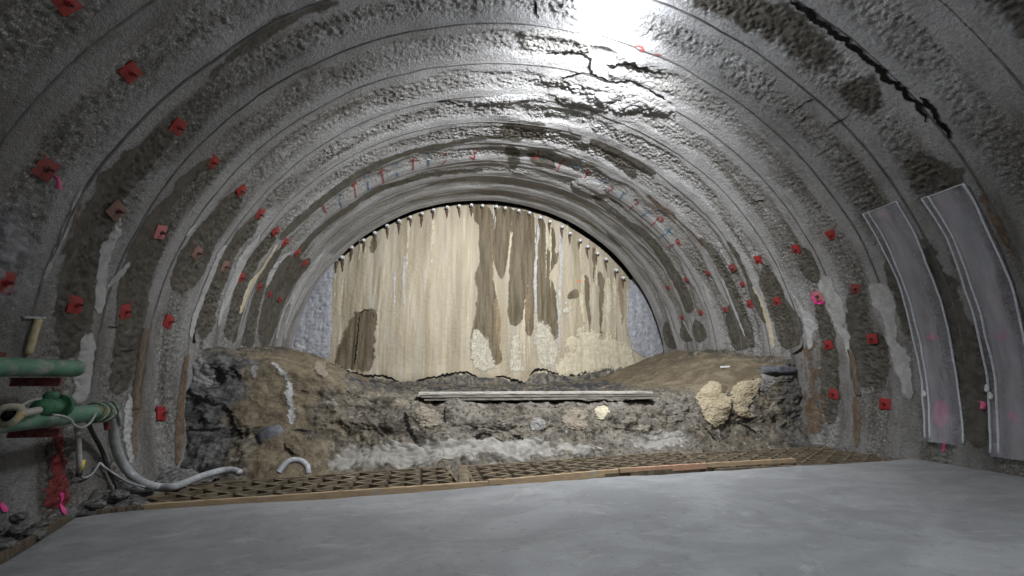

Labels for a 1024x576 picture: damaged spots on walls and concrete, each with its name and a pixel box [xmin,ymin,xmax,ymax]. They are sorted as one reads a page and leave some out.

crack [547,51,671,103]
crack [790,0,951,139]
water stain [171,121,635,376]